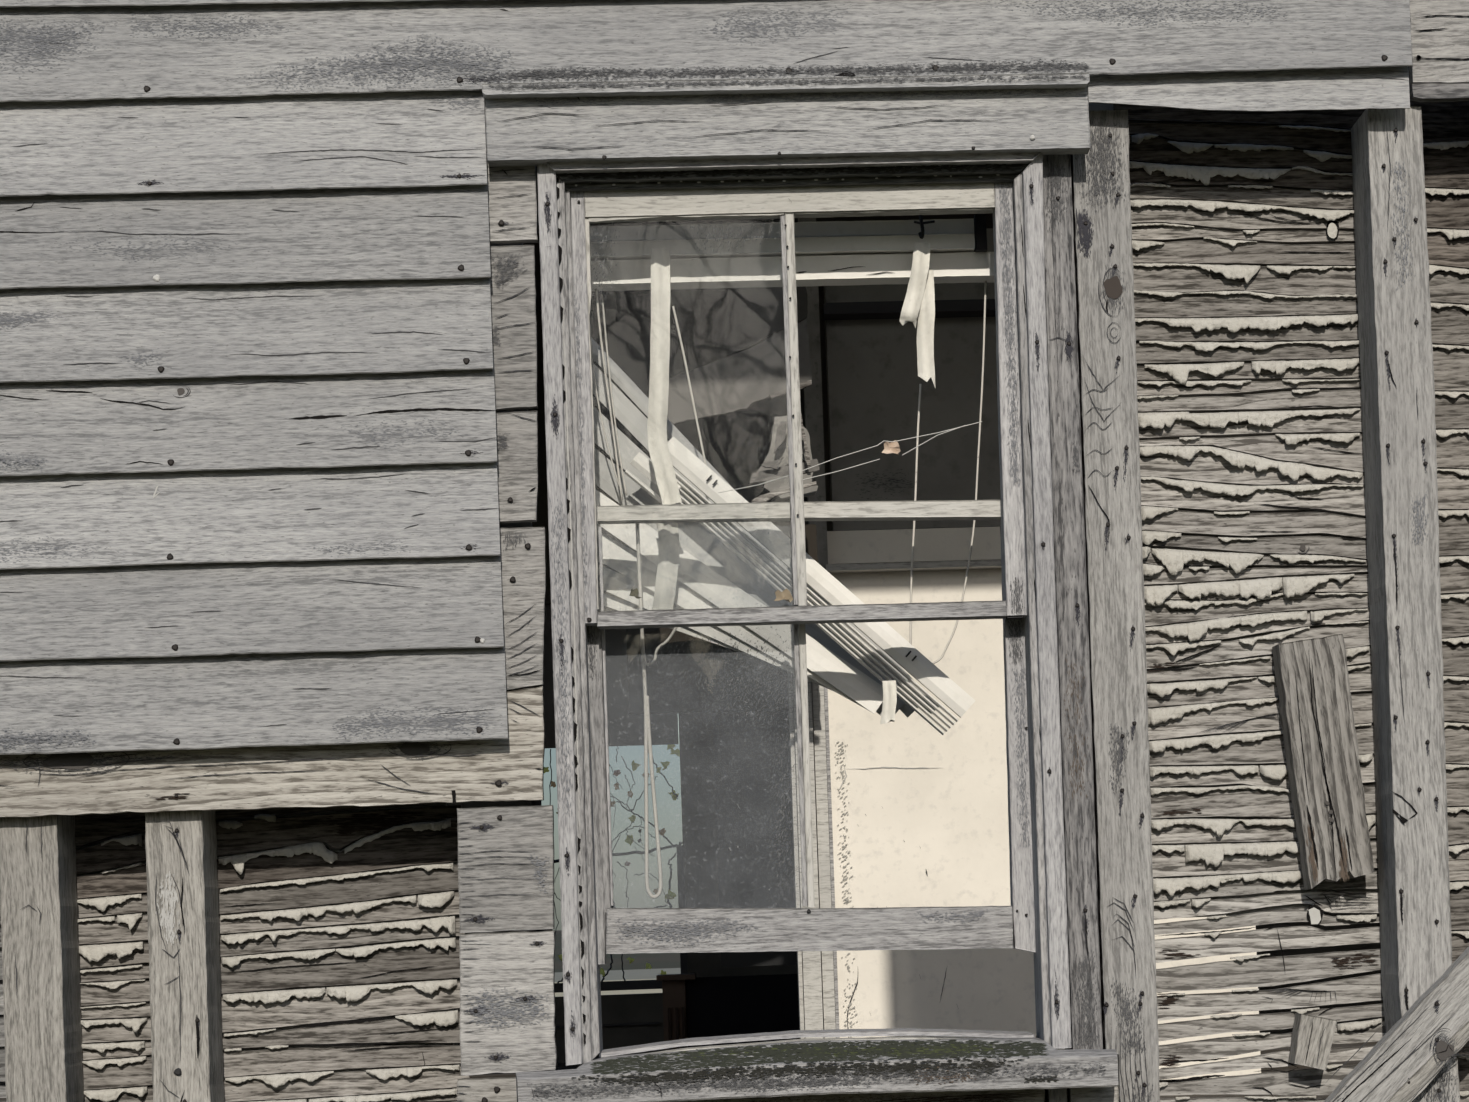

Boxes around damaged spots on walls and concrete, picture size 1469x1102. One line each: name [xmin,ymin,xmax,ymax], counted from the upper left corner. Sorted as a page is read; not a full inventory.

crack [0,203,224,235]
crack [193,293,295,301]
peeling [1129,133,1363,515]
crack [0,362,191,464]
crack [232,277,536,529]
peeling [1141,506,1370,796]
peeling [220,891,456,967]
damp [835,741,854,908]
damp [1159,950,1201,958]
peeling [1151,819,1302,938]
damp [1332,950,1380,969]
damp [527,950,1183,1102]